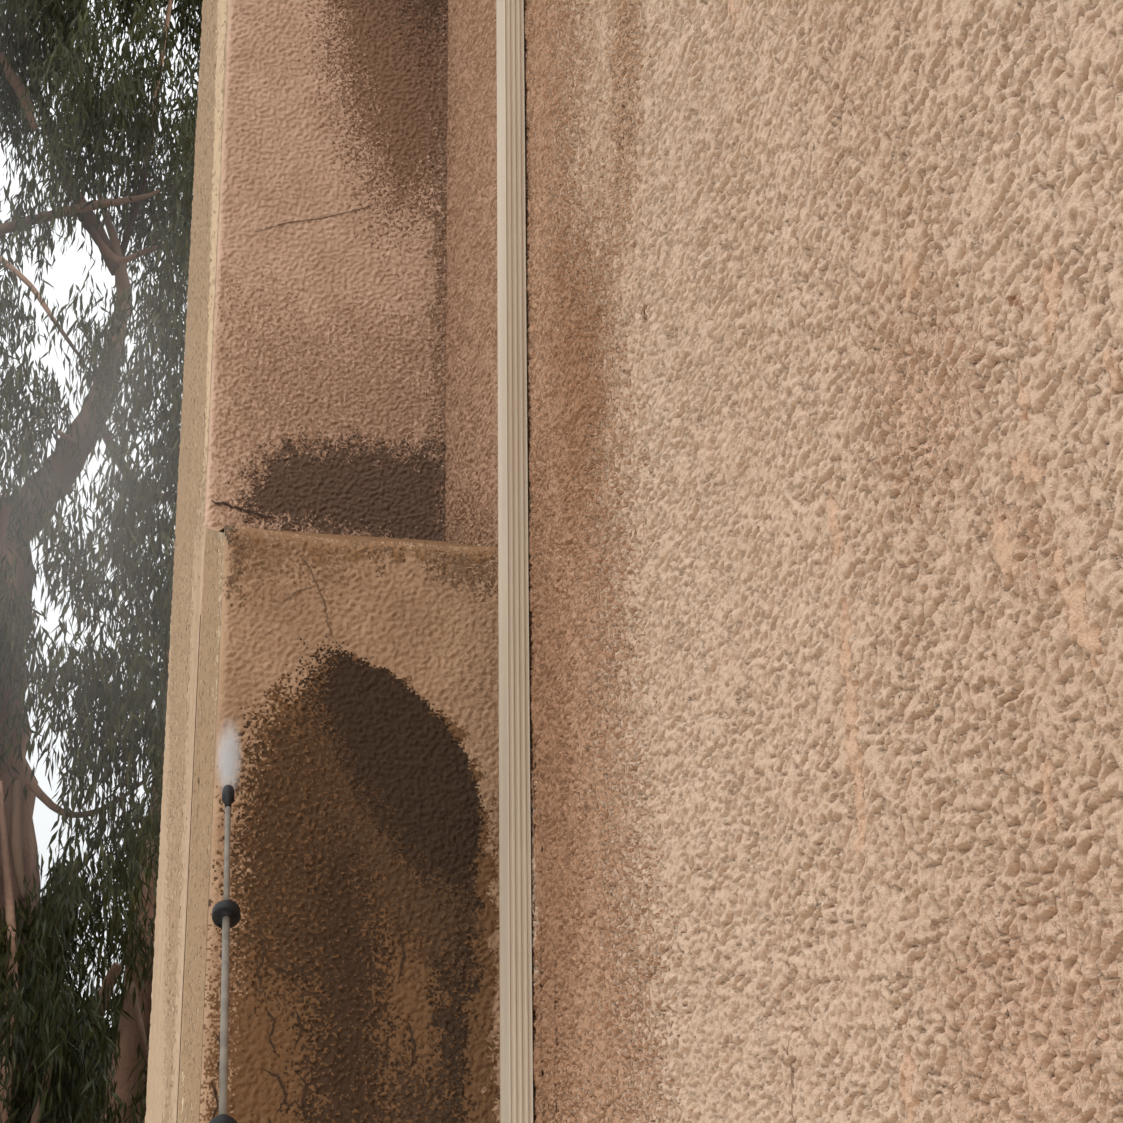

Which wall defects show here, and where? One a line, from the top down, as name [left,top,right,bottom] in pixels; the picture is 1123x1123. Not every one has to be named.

water stain [530,779,540,990]